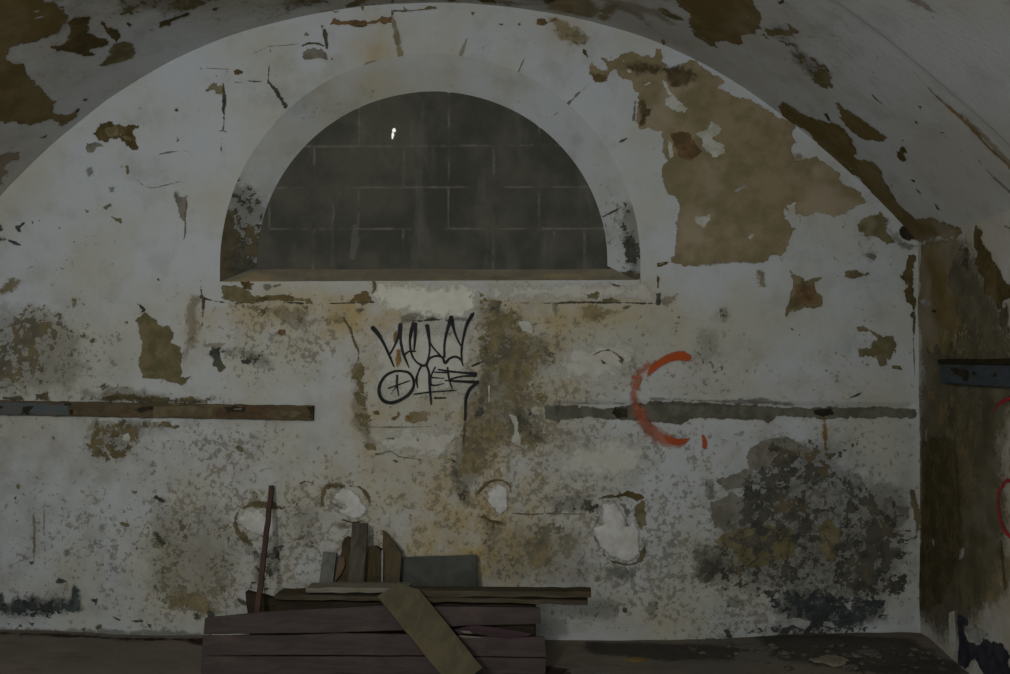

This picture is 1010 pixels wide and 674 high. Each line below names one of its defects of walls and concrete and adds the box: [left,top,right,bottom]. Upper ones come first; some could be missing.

peeling [0,0,136,127]
peeling [0,152,20,185]
peeling [85,121,139,153]
peeling [565,31,1010,356]
damp [543,203,661,321]
peeling [136,303,191,385]
peeling [857,325,902,370]
damp [401,292,554,503]
damp [692,239,1010,674]
damp [483,493,599,586]
damp [586,630,739,661]
peeling [948,611,980,674]